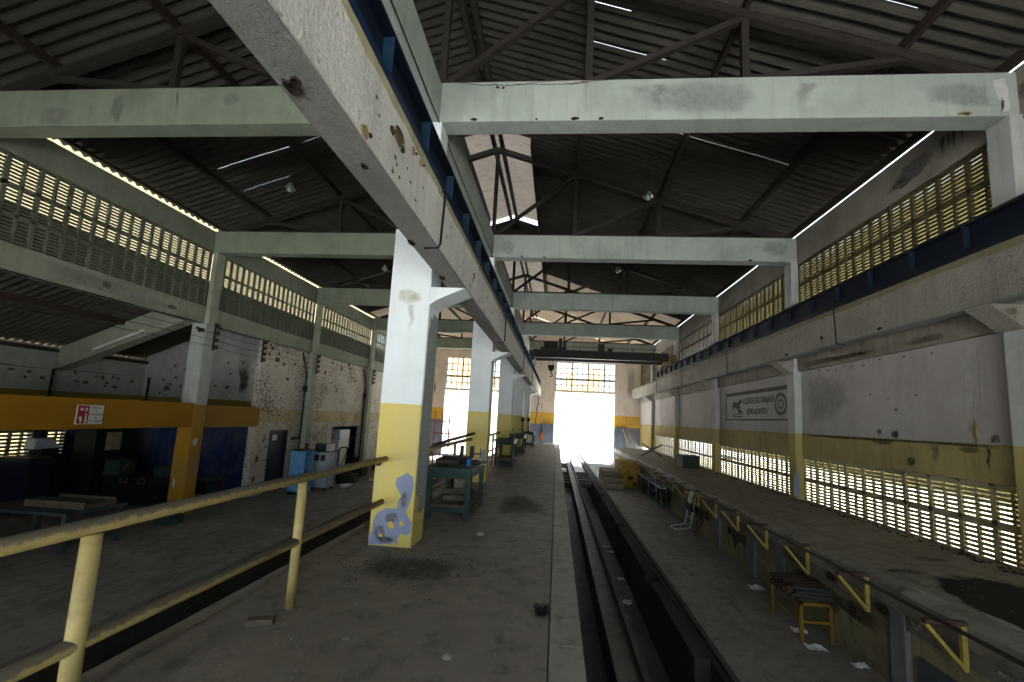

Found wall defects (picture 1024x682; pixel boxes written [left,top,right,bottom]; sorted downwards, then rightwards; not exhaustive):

peeling [368,316,439,546]